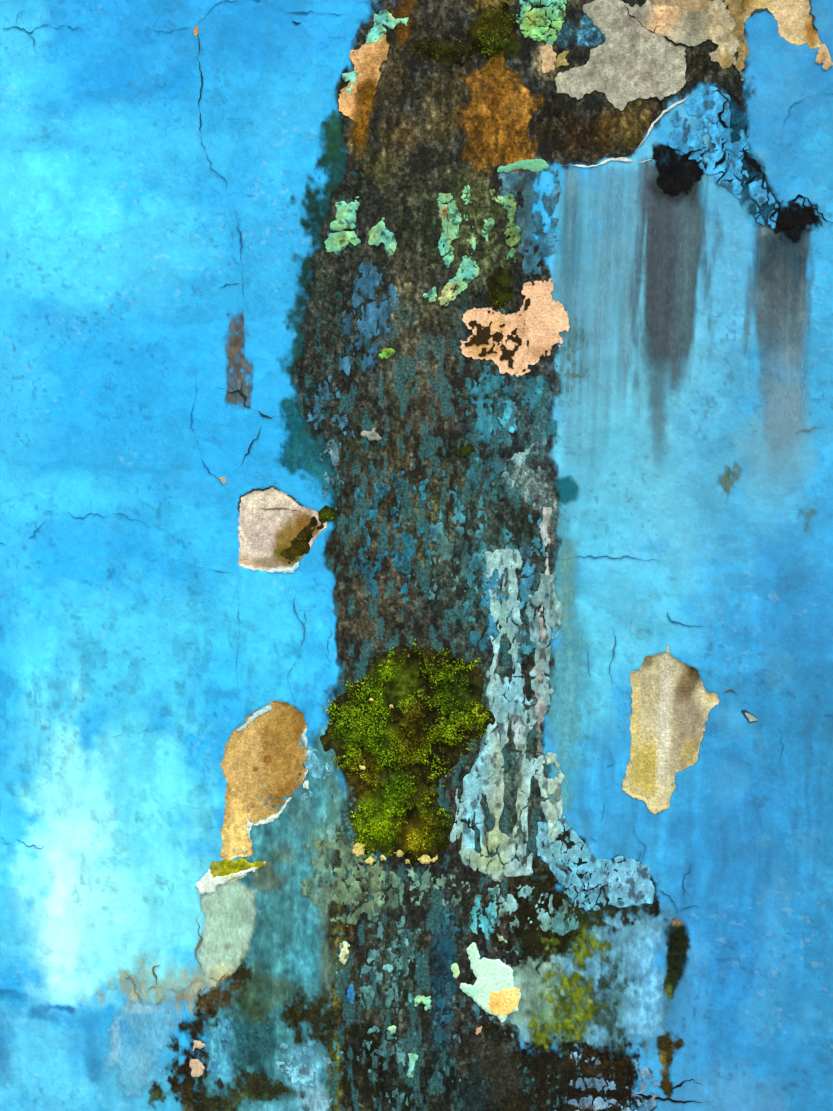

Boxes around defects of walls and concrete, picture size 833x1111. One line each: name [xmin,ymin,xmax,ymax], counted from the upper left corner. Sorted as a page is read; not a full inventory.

crack [150,0,361,297]
corrosion [353,81,375,144]
corrosion [394,0,416,45]
corrosion [452,51,544,179]
crack [683,80,833,433]
leakage [225,313,253,408]
crack [190,377,300,512]
peeling [238,486,327,574]
leakage [282,0,822,1111]
peeling [300,0,833,1111]
peeling [195,701,333,895]
leakage [149,879,289,1111]